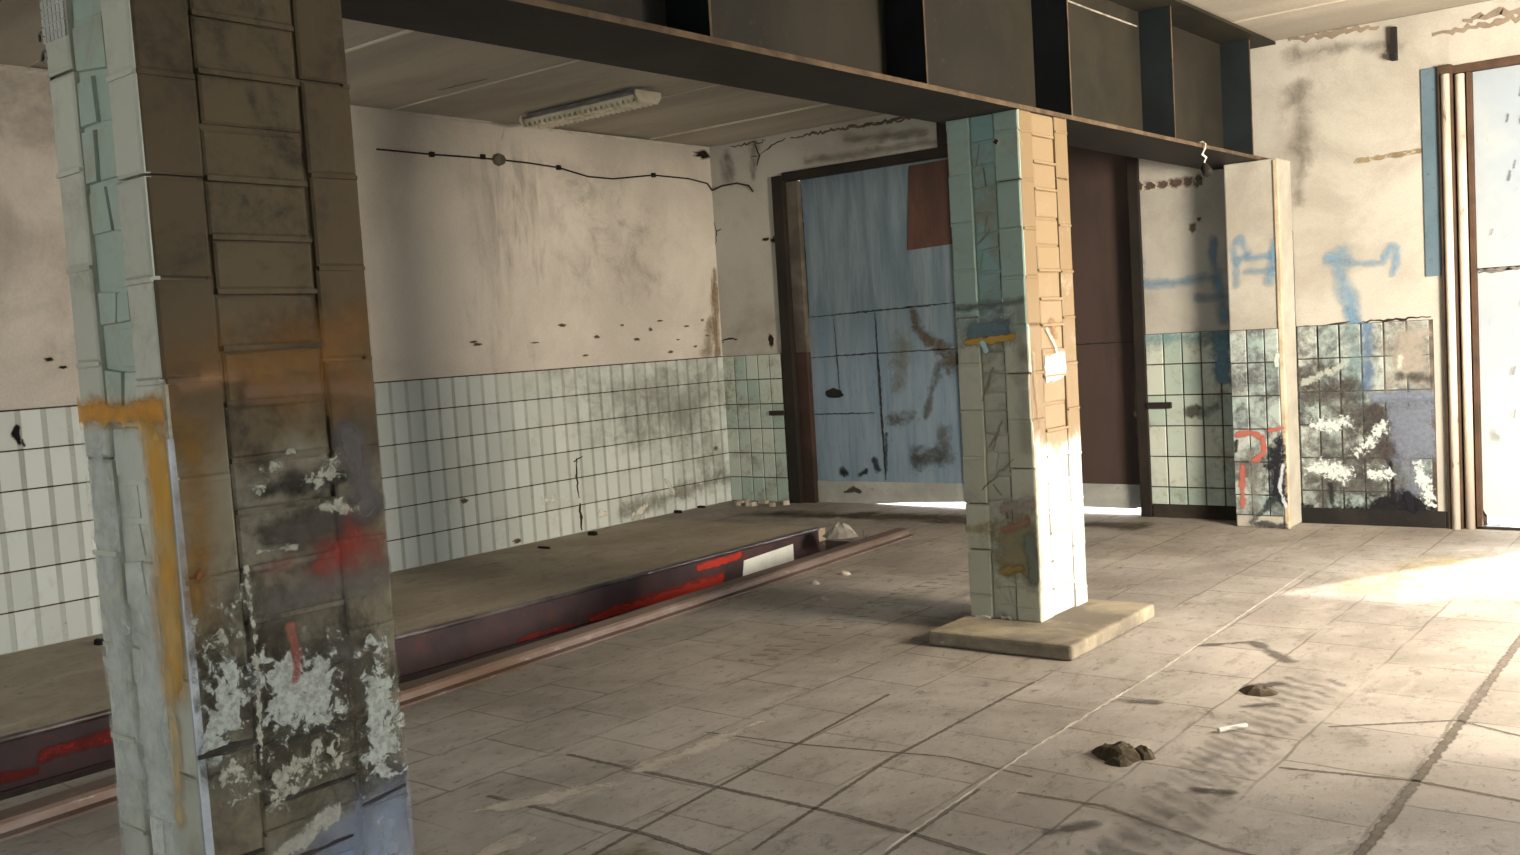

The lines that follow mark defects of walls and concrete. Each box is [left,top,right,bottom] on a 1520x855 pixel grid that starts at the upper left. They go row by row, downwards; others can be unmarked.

spalling [1288,25,1380,43]
spalling [1432,7,1520,36]
peeling [252,448,296,496]
peeling [304,453,360,515]
spalling [187,527,850,813]
spalling [0,708,116,801]
peeling [273,803,342,855]